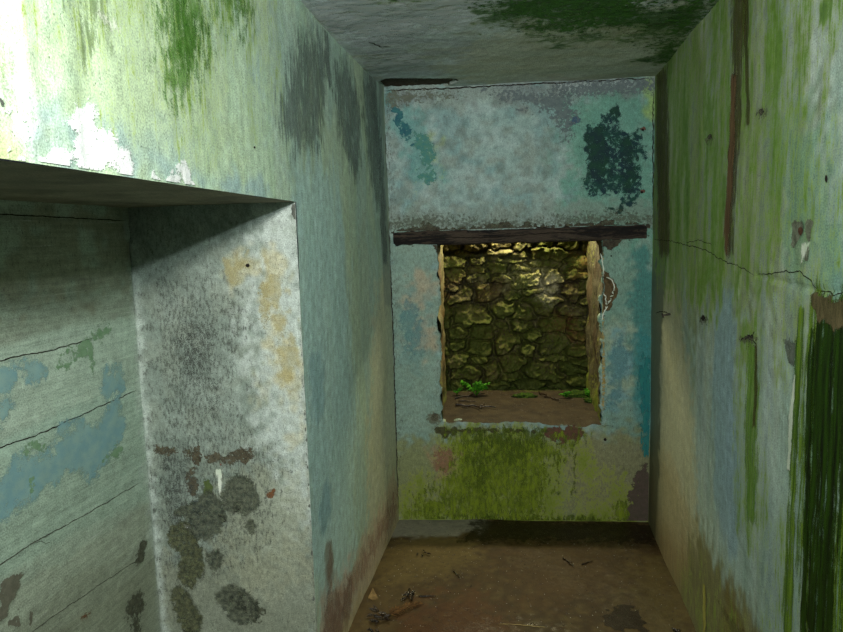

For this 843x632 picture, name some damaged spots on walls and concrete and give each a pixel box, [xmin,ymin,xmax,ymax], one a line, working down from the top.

peeling [38,98,134,175]
peeling [151,159,195,185]
damp [275,25,465,264]
damp [481,67,670,262]
damp [723,0,750,255]
crack [0,338,94,361]
crack [0,391,134,448]
crack [0,484,137,565]
damp [153,444,255,534]
damp [457,463,656,545]
damp [783,305,843,632]
crack [34,562,135,631]